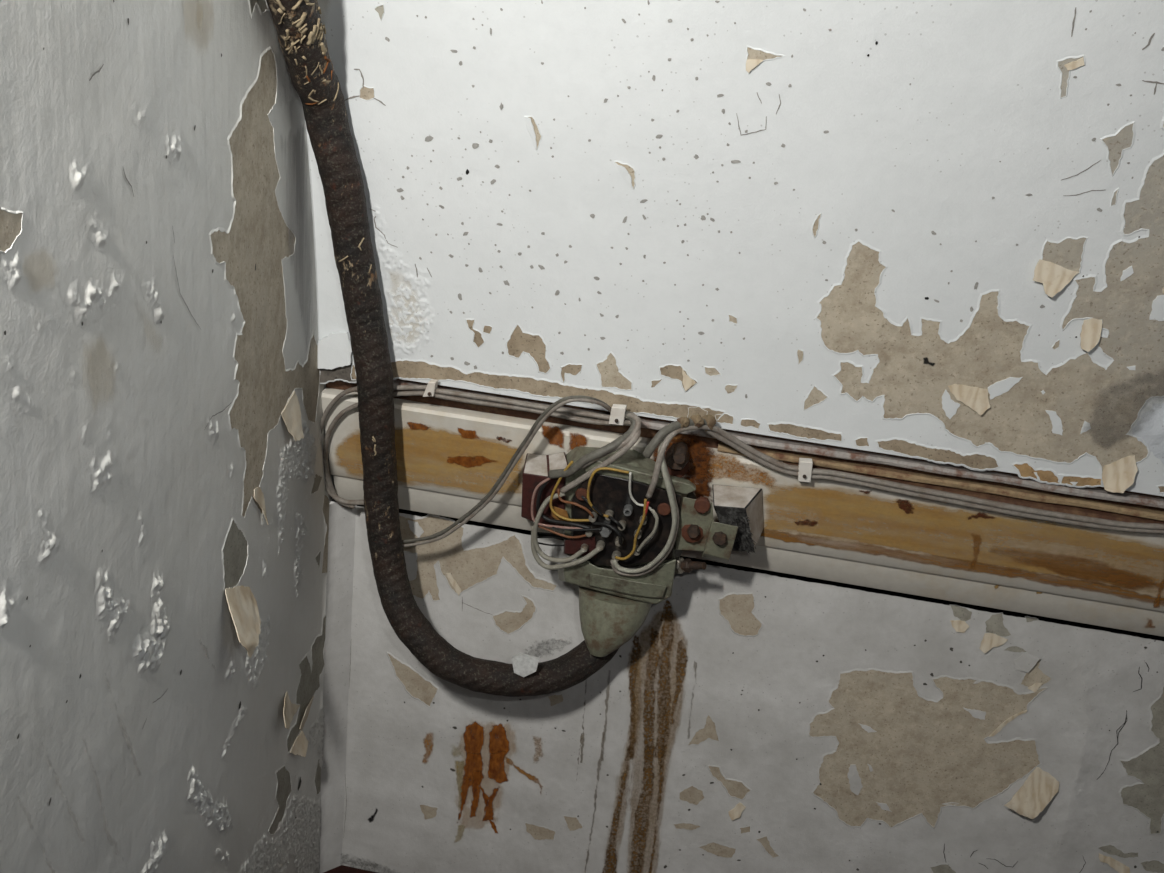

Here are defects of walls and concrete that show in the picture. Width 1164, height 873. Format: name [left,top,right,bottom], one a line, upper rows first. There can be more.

peeling [745,45,793,73]
peeling [1056,54,1086,99]
peeling [209,46,357,658]
peeling [391,115,1164,493]
rust [653,433,1164,628]
peeling [949,604,1012,653]
peeling [268,614,326,836]
rust [456,722,542,838]
peeling [807,647,1059,829]
peeling [1118,671,1164,835]